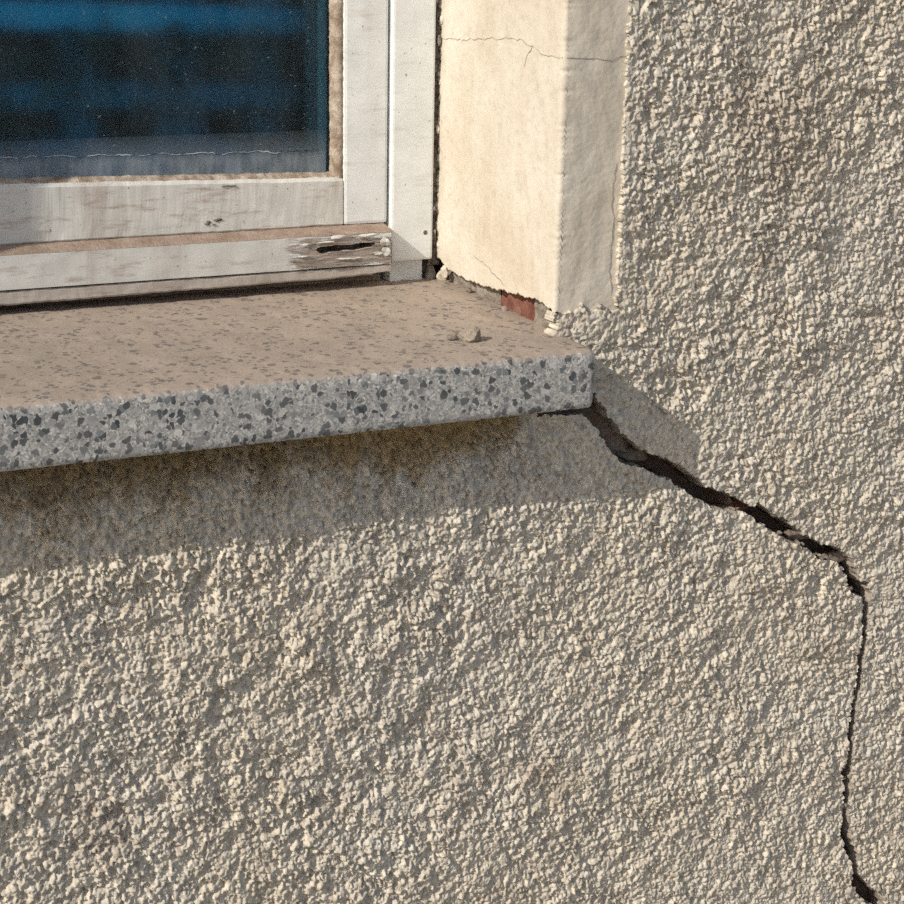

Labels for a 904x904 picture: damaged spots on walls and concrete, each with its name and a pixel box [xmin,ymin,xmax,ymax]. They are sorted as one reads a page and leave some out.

crack [536,393,885,904]